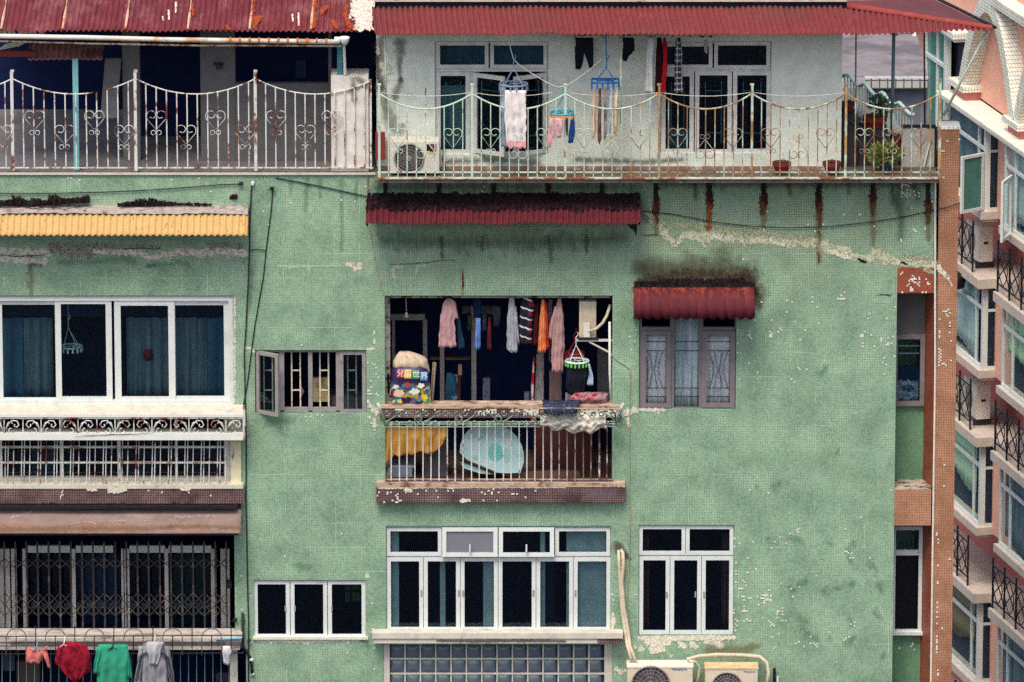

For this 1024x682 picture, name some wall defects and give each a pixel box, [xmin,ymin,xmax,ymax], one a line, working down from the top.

rust [311,0,338,29]
rust [652,183,660,224]
rust [705,183,714,230]
rust [759,183,768,215]
rust [815,183,824,263]
rust [924,183,933,225]
flaking render [641,209,953,293]
damp [640,260,761,307]
flaking render [577,407,666,428]
flaking render [377,487,566,503]